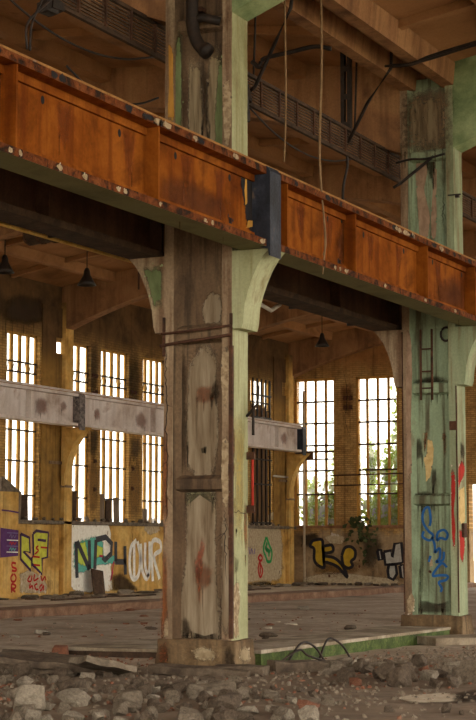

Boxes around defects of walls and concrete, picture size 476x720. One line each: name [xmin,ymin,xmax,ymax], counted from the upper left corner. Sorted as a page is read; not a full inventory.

peeling [202,292,222,324]
peeling [424,440,434,481]
peeling [195,648,215,661]